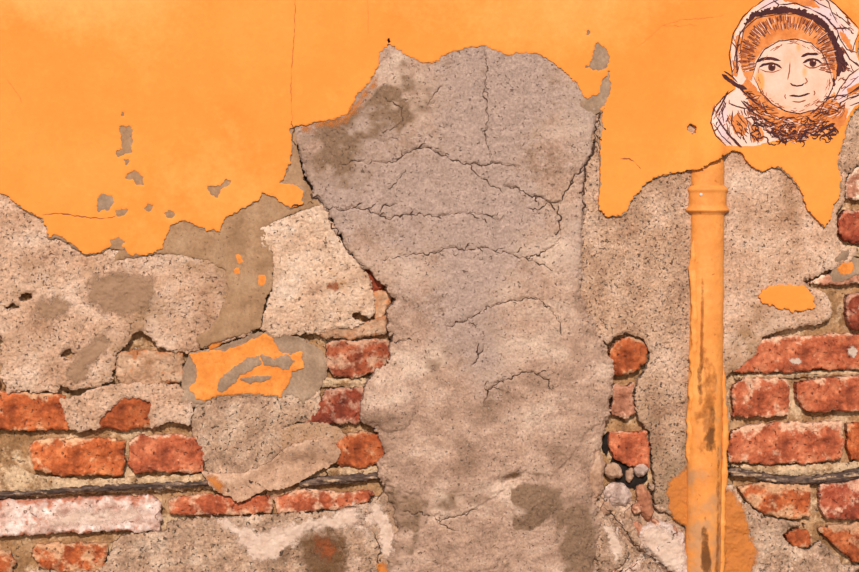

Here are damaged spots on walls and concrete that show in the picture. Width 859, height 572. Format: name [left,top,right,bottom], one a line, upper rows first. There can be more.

peeling [116,112,144,185]
crack [290,5,606,272]
peeling [207,180,231,198]
crack [448,297,561,364]
spalling [579,42,691,572]
spalling [722,109,859,572]
spalling [0,193,399,572]
crack [483,370,552,404]
damp [219,502,395,572]